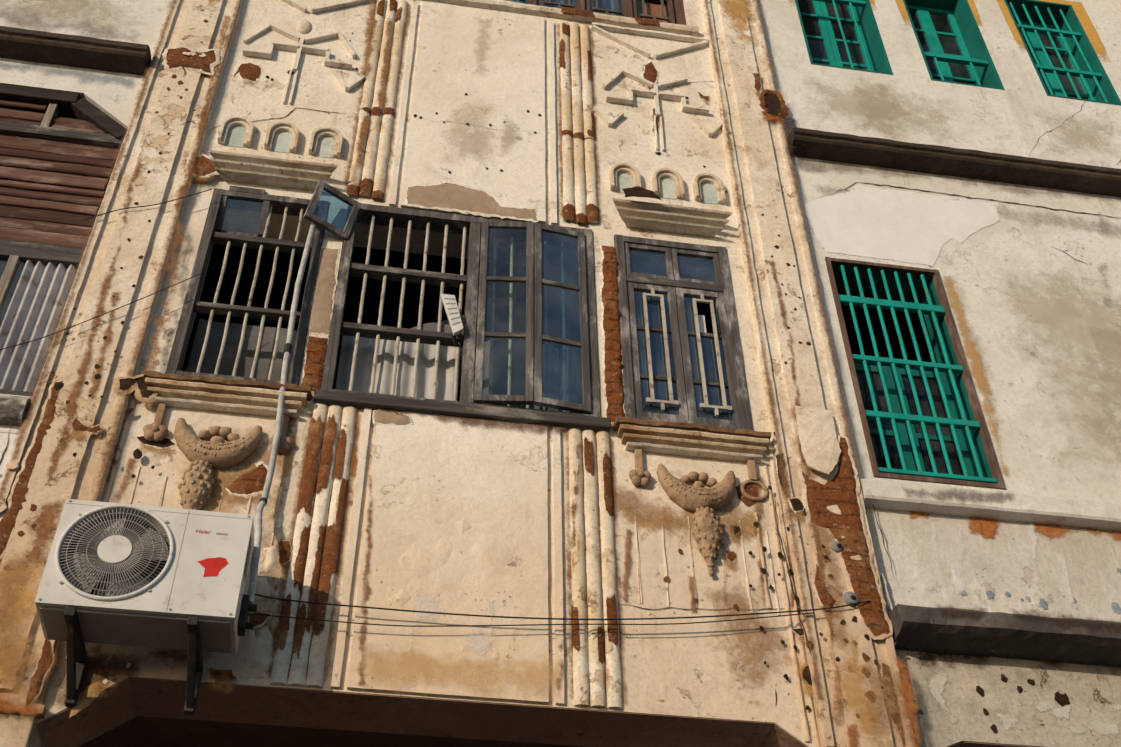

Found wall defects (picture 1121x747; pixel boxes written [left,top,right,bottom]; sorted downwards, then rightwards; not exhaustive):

spalling [162,41,220,98]
spalling [231,61,274,84]
spalling [753,73,789,119]
peeling [405,171,539,222]
flaking render [800,185,1000,266]
spalling [600,245,626,426]
spalling [84,364,159,414]
spalling [0,379,70,571]
spalling [584,437,614,516]
spalling [248,415,349,660]
spalling [736,406,906,747]
spalling [597,593,619,665]